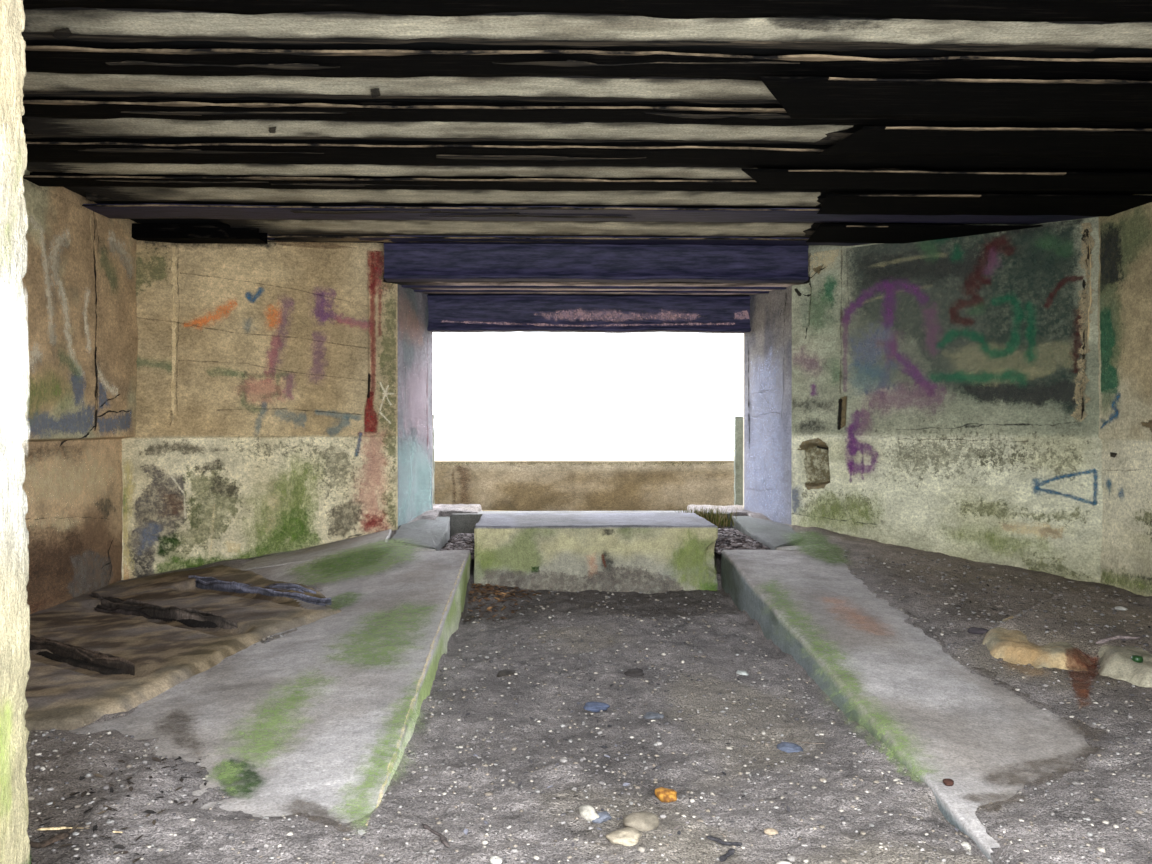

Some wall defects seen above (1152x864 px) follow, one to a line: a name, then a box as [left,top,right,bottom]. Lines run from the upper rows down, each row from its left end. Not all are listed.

crack [59,210,131,447]
water stain [140,436,365,554]